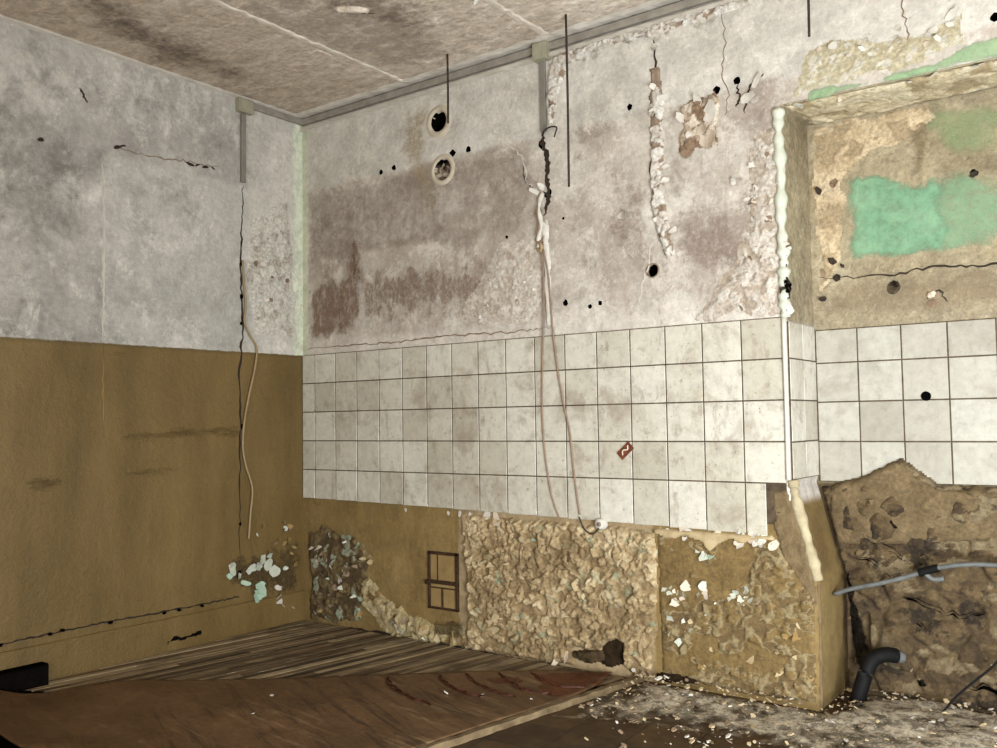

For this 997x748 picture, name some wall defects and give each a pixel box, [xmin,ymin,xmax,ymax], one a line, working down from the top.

spalling [676,91,720,159]
peeling [771,5,997,317]
crack [0,145,244,647]
leakage [312,241,480,336]
crack [821,262,997,307]
peeling [348,479,823,711]
flaking render [822,458,997,712]